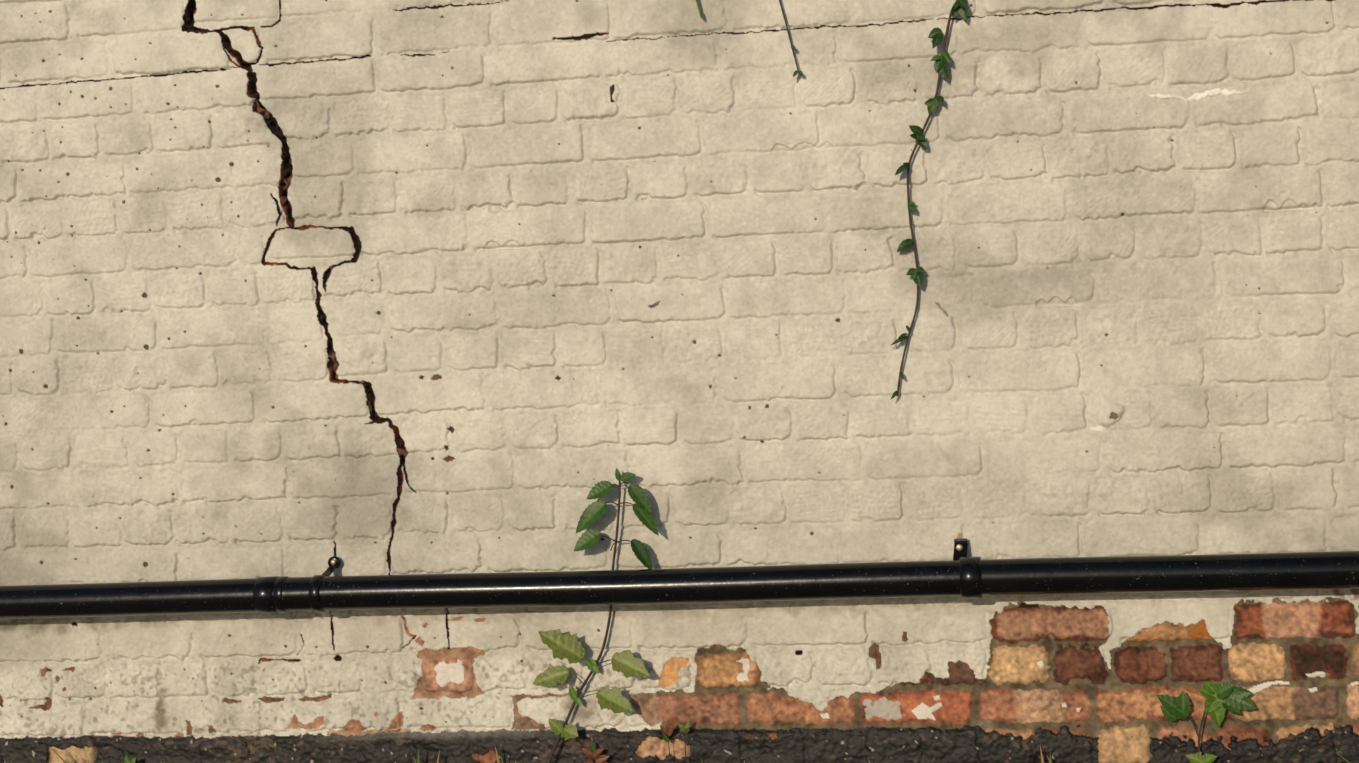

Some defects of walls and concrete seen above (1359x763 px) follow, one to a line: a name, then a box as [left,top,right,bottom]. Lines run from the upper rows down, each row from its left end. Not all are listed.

crack [0,0,449,575]
peeling [0,666,75,718]
peeling [175,720,216,737]
crack [258,610,335,665]
peeling [222,615,582,736]
peeling [628,597,1359,763]